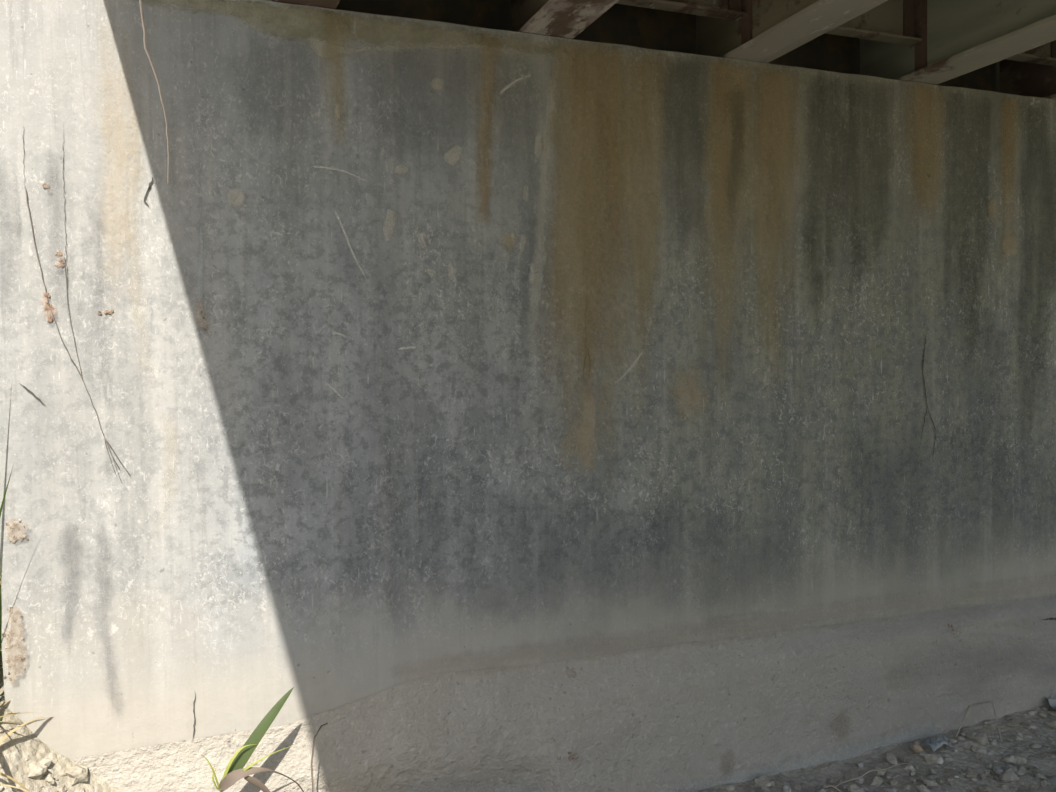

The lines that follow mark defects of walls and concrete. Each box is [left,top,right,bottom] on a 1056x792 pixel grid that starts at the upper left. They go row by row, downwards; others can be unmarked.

crack [919,333,936,459]